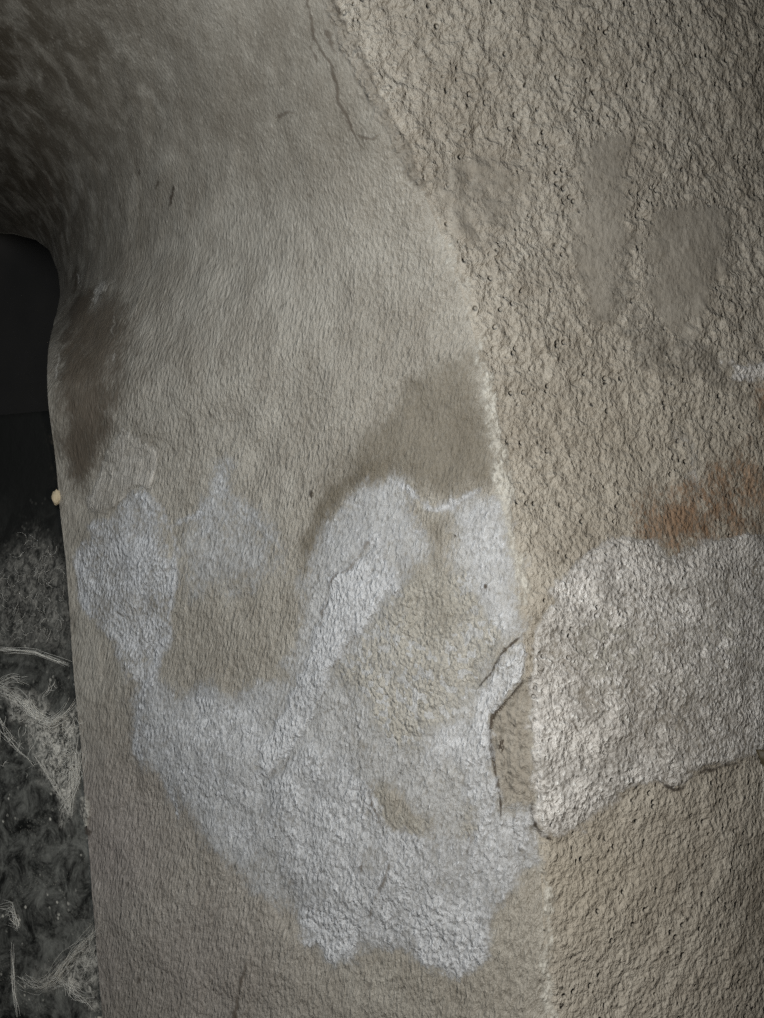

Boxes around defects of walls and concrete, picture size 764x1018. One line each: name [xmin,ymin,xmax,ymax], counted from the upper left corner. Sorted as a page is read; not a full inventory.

efflorescence [721,361,764,382]
efflorescence [74,474,764,978]
flaking render [336,569,551,850]